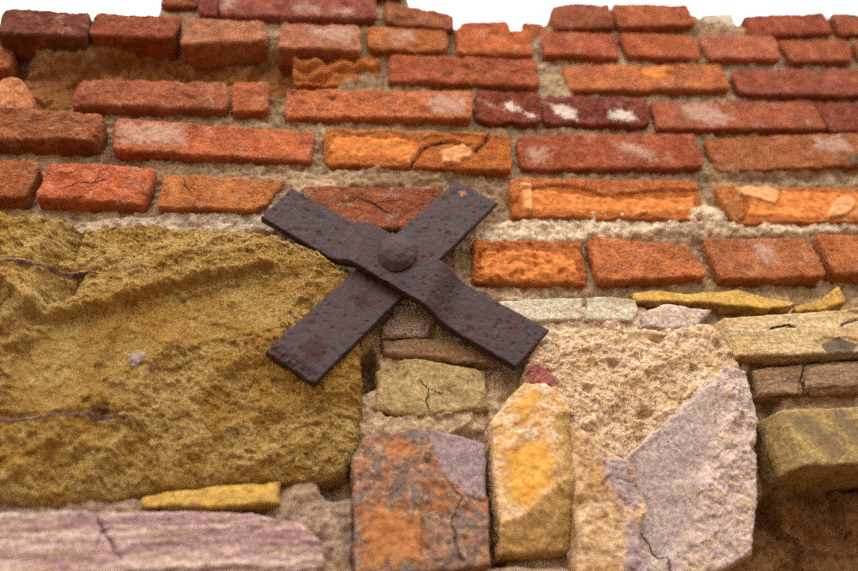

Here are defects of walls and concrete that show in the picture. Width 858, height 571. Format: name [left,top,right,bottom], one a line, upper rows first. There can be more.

water stain [552,104,577,121]
water stain [608,109,637,121]
crack [0,258,97,279]
crack [0,407,138,423]